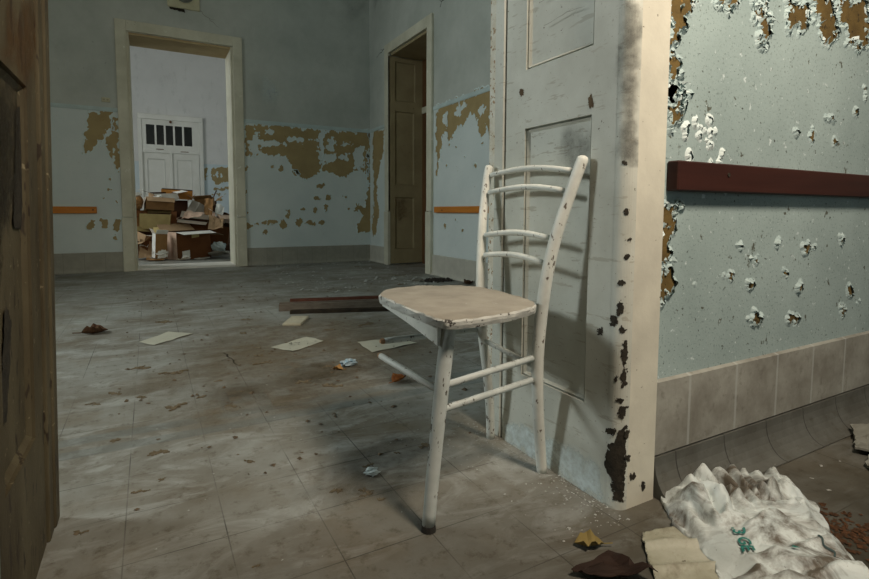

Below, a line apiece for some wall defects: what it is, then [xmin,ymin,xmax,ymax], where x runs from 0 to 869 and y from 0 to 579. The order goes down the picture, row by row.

peeling [81,110,120,174]
peeling [204,166,229,202]
peeling [244,123,384,238]
peeling [435,85,490,178]
peeling [667,0,869,163]
spalling [597,301,646,502]